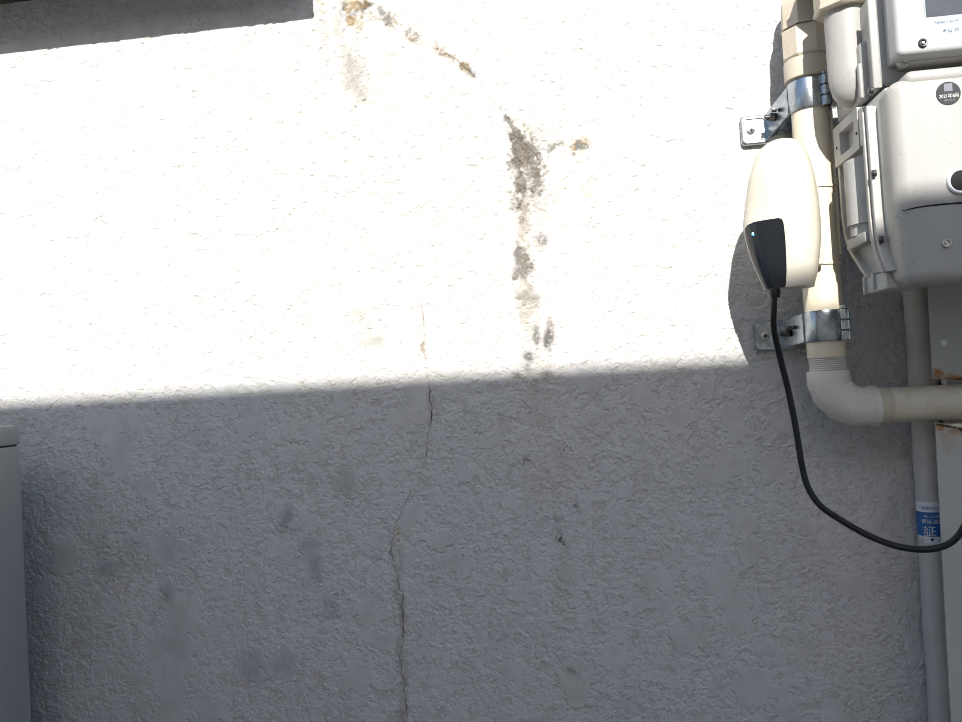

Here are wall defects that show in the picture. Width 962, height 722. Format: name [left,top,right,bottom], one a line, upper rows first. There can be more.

leakage [509,131,540,179]